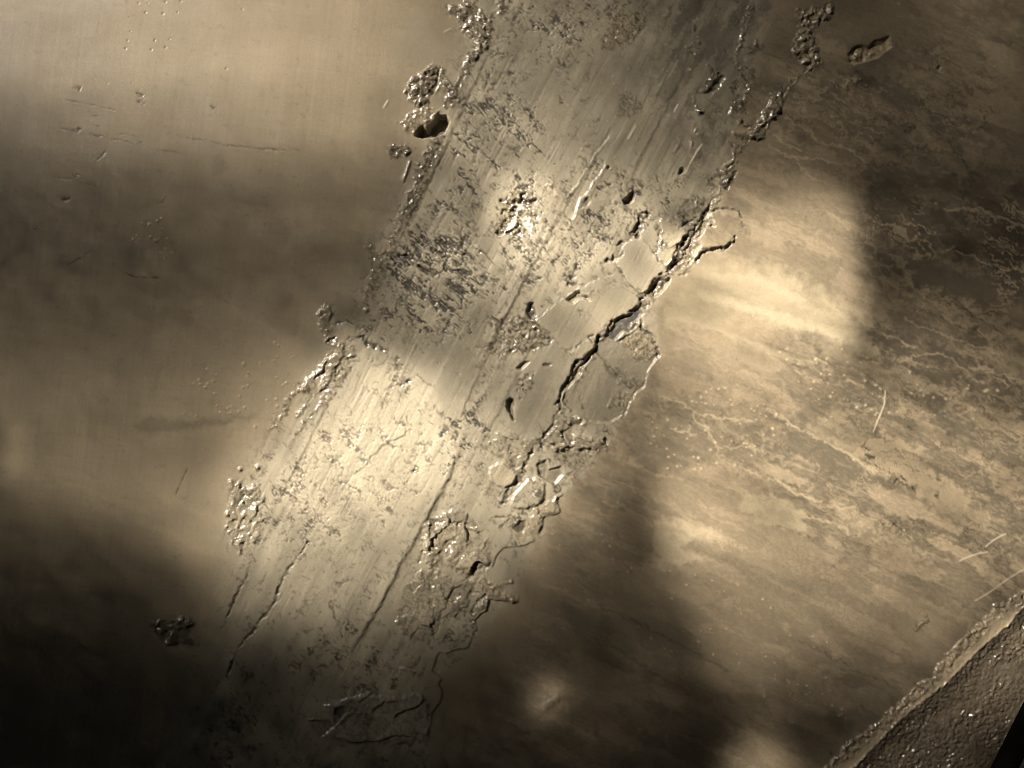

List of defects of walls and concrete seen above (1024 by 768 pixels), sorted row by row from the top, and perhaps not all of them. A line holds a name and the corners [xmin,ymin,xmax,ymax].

spalling [848,35,892,66]
spalling [222,0,837,751]
crack [500,206,751,508]
damp [537,0,1024,699]
crack [221,539,311,678]